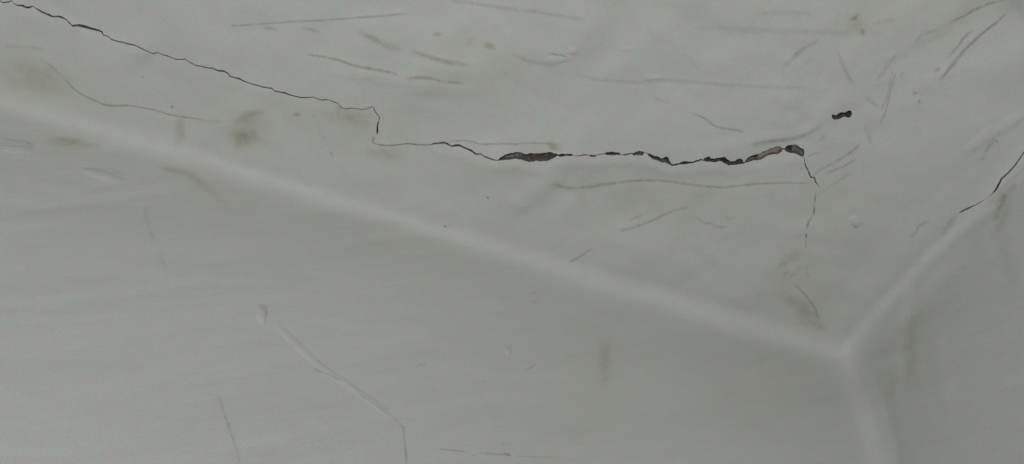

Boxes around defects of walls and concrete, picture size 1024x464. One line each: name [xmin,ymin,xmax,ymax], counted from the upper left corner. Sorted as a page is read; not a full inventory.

crack [0,0,819,186]